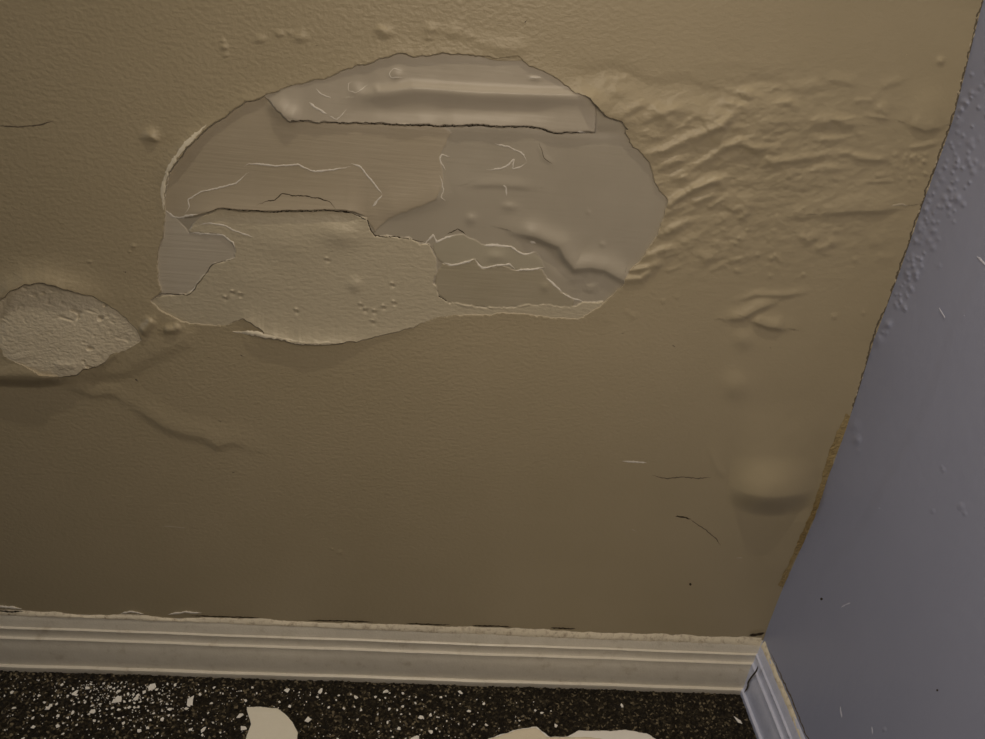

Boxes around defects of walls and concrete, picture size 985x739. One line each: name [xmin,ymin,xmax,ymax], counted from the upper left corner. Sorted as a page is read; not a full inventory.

peeling [126,19,668,377]
flaking render [0,283,142,378]
peeling [236,707,312,739]